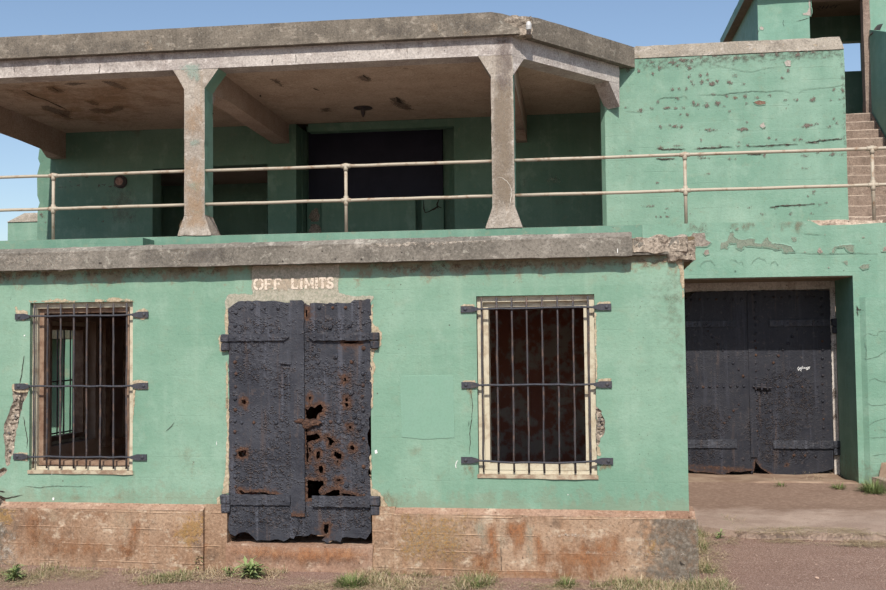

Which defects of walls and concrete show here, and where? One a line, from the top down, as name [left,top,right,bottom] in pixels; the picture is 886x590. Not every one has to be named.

spalling [639,55,771,130]
spalling [807,191,886,225]
peeling [689,227,805,256]
peeling [663,258,684,298]
peeling [594,301,611,382]
spalling [0,383,29,477]
spalling [595,407,605,456]